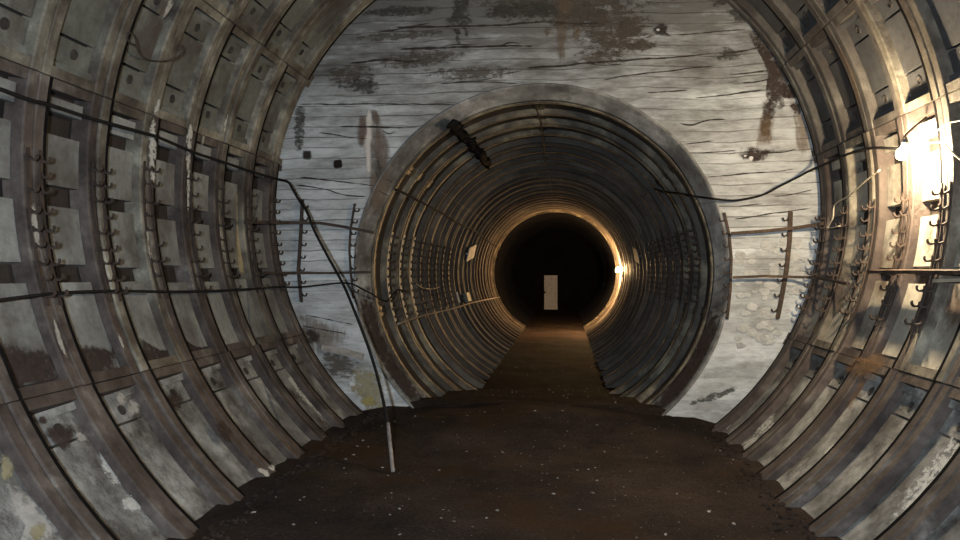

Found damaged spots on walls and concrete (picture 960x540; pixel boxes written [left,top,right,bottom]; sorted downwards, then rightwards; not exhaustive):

water stain [358,0,655,80]
water stain [324,65,379,94]
crack [302,21,769,153]
water stain [364,110,382,177]
crack [297,177,392,197]
water stain [323,352,357,378]
water stain [654,310,720,408]
water stain [690,388,735,405]